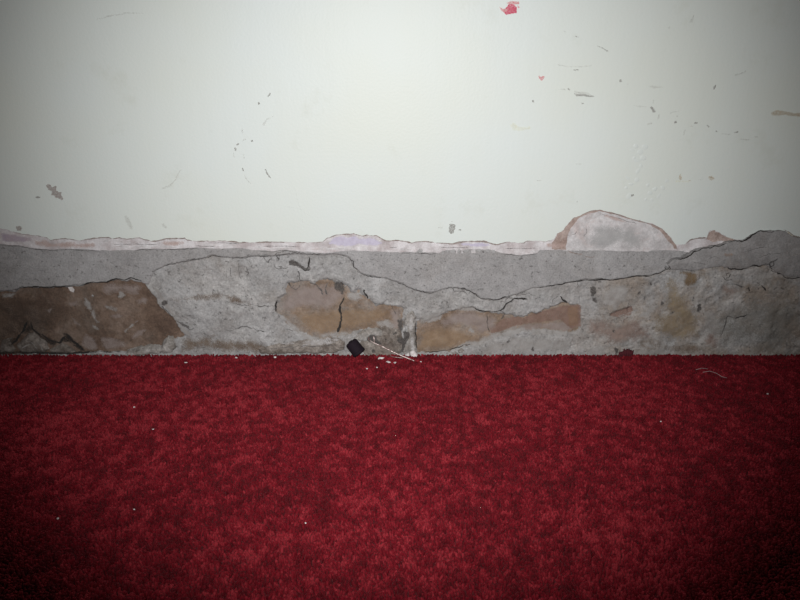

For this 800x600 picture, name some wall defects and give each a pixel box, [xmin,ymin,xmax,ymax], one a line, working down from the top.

crack [153,251,321,286]
peeling [0,210,739,271]
crack [345,230,774,311]
crack [723,259,800,291]
spalling [0,277,194,356]
crack [336,298,344,332]
spalling [258,279,581,357]